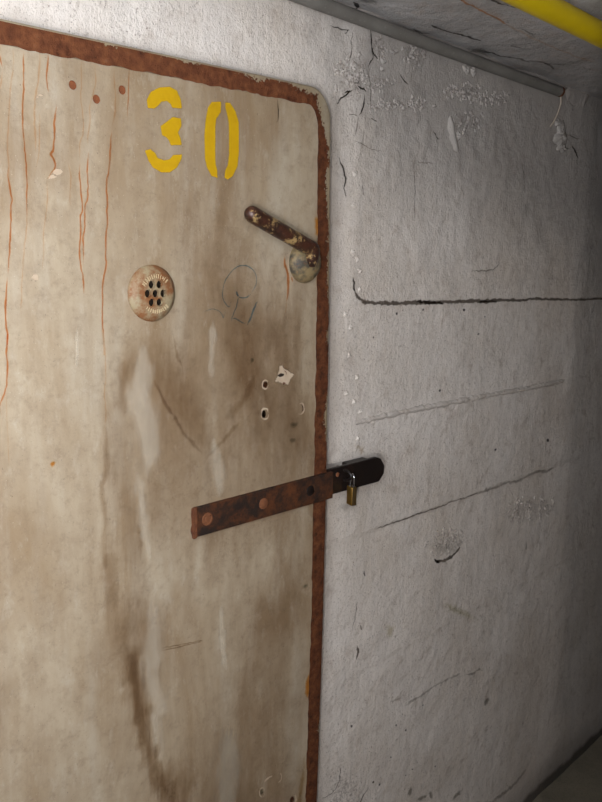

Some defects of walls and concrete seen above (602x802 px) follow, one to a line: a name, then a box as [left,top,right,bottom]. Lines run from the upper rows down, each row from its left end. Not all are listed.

crack [432,25,481,41]
crack [337,86,376,121]
rust [0,21,330,475]
crack [353,278,602,306]
crack [378,493,476,528]
rust [305,500,326,802]